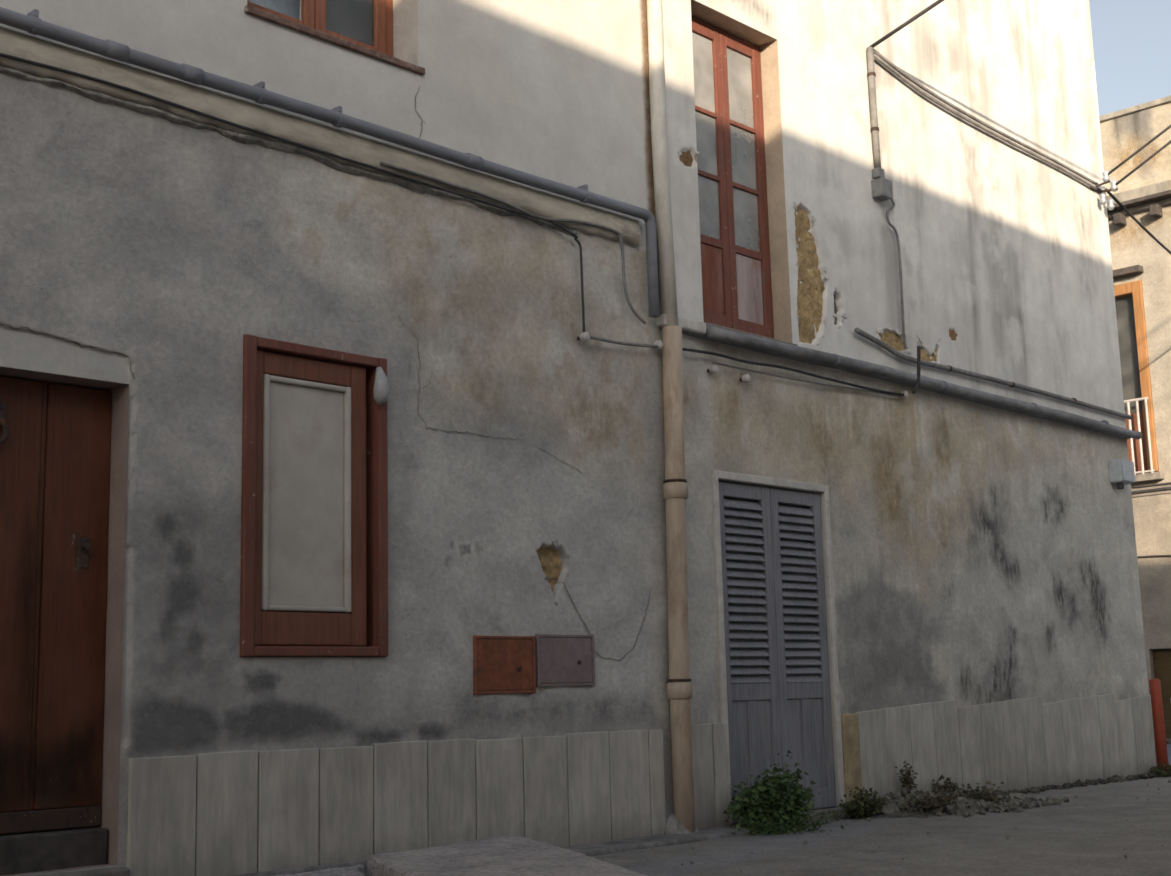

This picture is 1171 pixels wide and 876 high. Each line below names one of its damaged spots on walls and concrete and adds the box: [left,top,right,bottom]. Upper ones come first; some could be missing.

spalling [678,150,699,167]
flaking render [793,201,847,346]
crack [0,323,135,380]
flaking render [876,326,939,363]
spalling [536,540,570,606]
leakage [134,674,342,751]